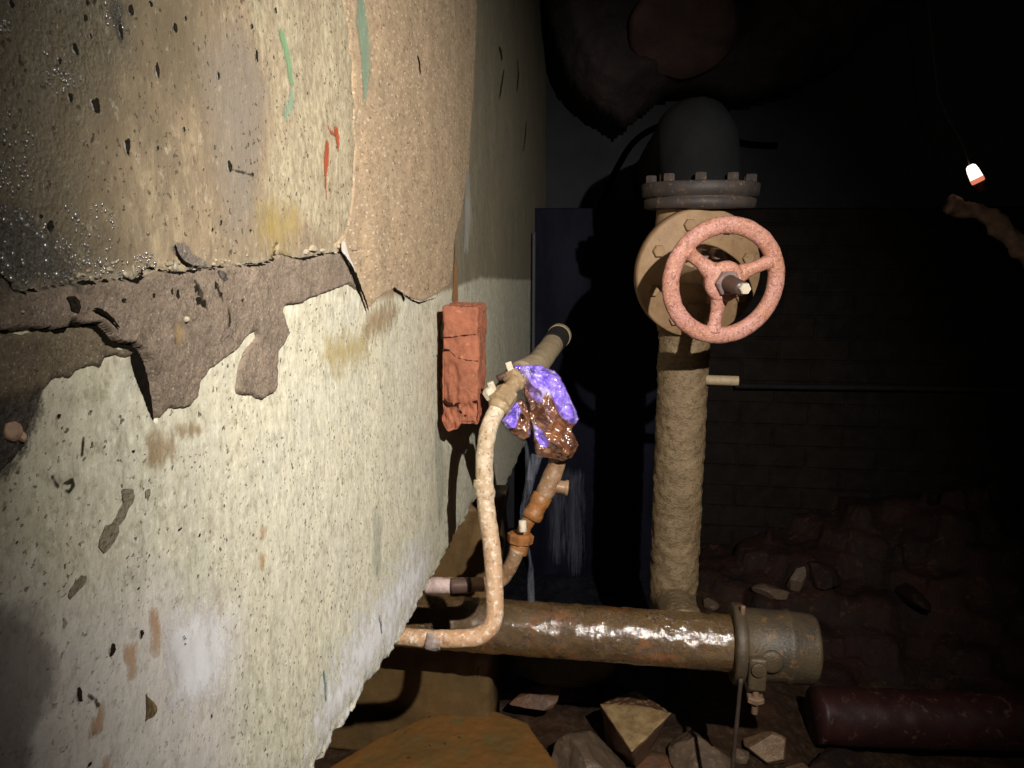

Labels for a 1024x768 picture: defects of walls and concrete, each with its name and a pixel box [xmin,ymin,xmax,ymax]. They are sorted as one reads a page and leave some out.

damp [0,206,81,291]
spalling [0,242,356,418]
peeling [99,489,151,553]